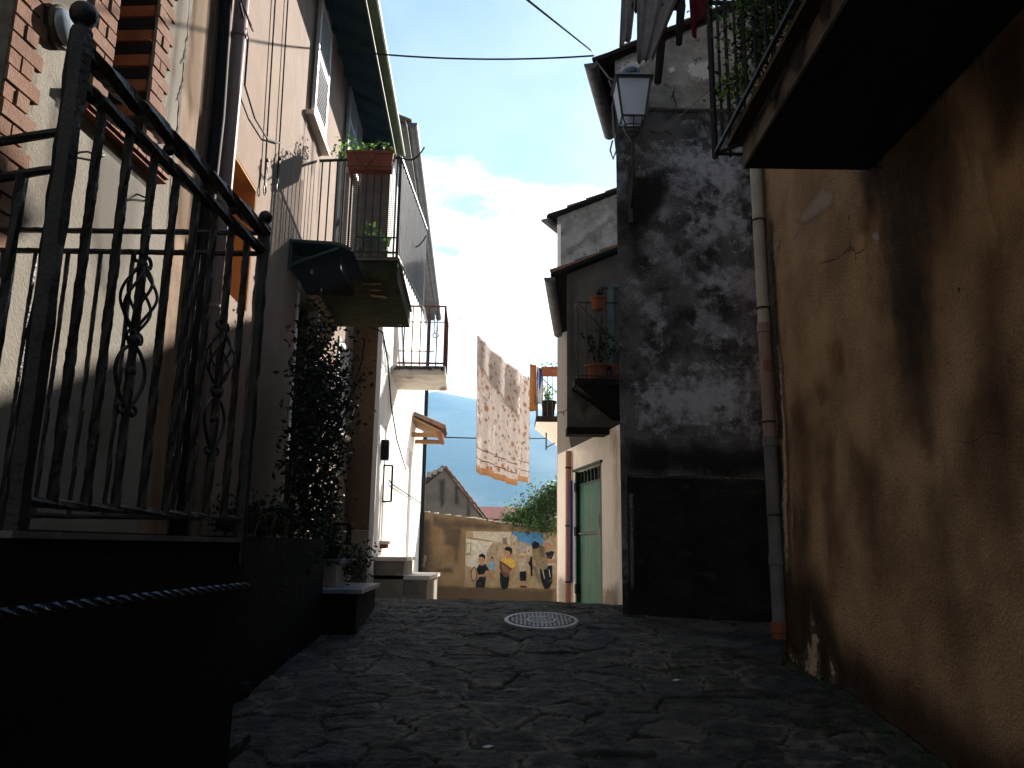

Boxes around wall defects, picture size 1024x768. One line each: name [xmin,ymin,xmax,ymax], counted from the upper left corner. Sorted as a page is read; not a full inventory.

damp [629,443,765,474]
flaking render [790,616,836,683]